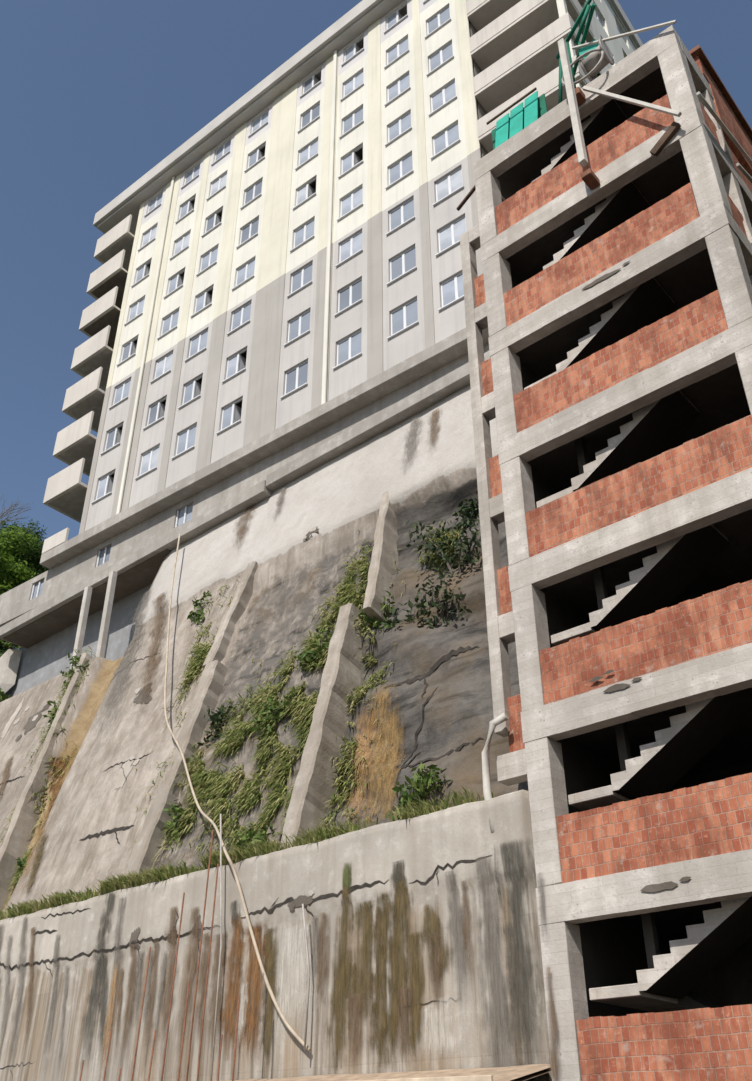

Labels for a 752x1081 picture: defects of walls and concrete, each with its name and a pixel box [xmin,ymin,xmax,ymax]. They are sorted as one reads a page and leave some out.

water stain [404,409,439,462]
crack [339,646,484,796]
spalling [589,670,642,692]
water stain [0,917,35,1038]
crack [80,825,134,844]
water stain [84,893,209,1054]
crack [0,855,491,977]
water stain [343,863,351,888]
water stain [349,893,462,1064]
water stain [446,841,544,1067]
water stain [547,967,558,1081]
spalling [640,876,691,892]